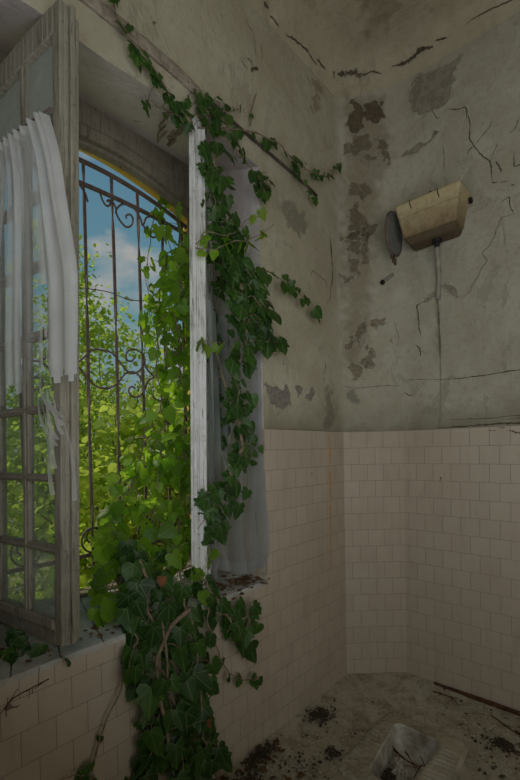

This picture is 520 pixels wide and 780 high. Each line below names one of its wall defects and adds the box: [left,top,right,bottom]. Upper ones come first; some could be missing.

crack [465,0,512,25]
crack [243,23,263,72]
crack [264,2,447,76]
flaking render [344,99,392,165]
crack [431,107,520,212]
flaking render [264,382,315,410]
crack [416,369,520,380]